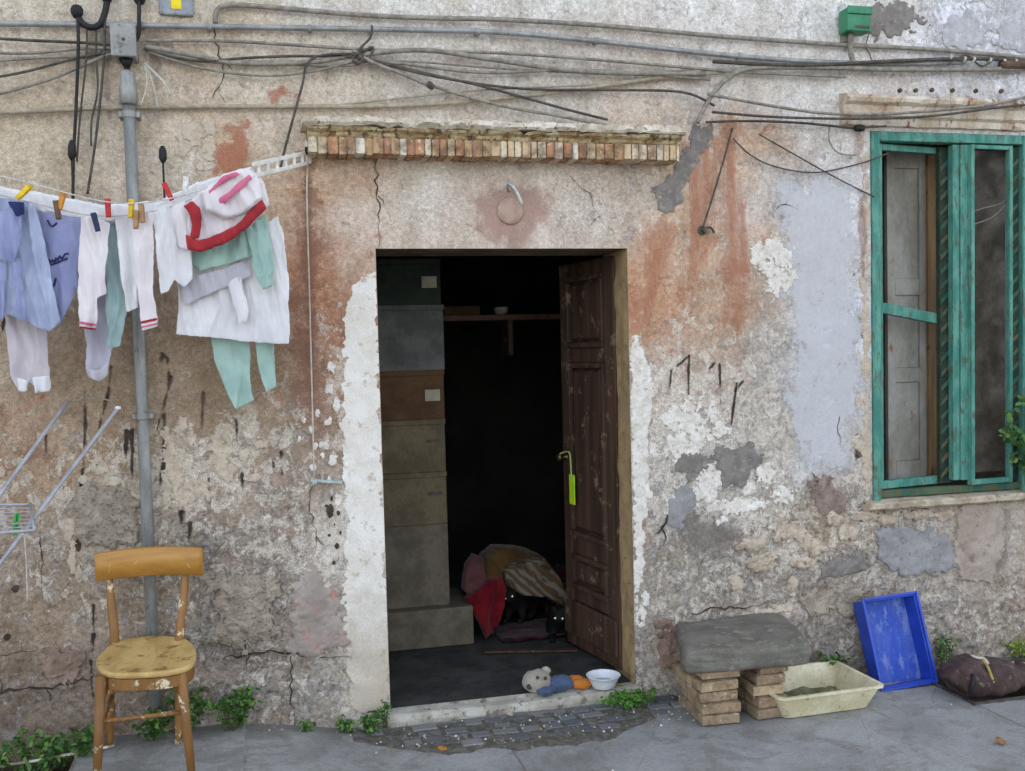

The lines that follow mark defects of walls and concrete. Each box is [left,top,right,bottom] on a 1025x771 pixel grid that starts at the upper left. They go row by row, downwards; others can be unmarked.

spalling [867,0,1025,54]
crack [374,159,384,247]
spalling [651,122,714,214]
peeling [749,235,799,300]
peeling [297,272,390,713]
peeling [629,335,849,669]